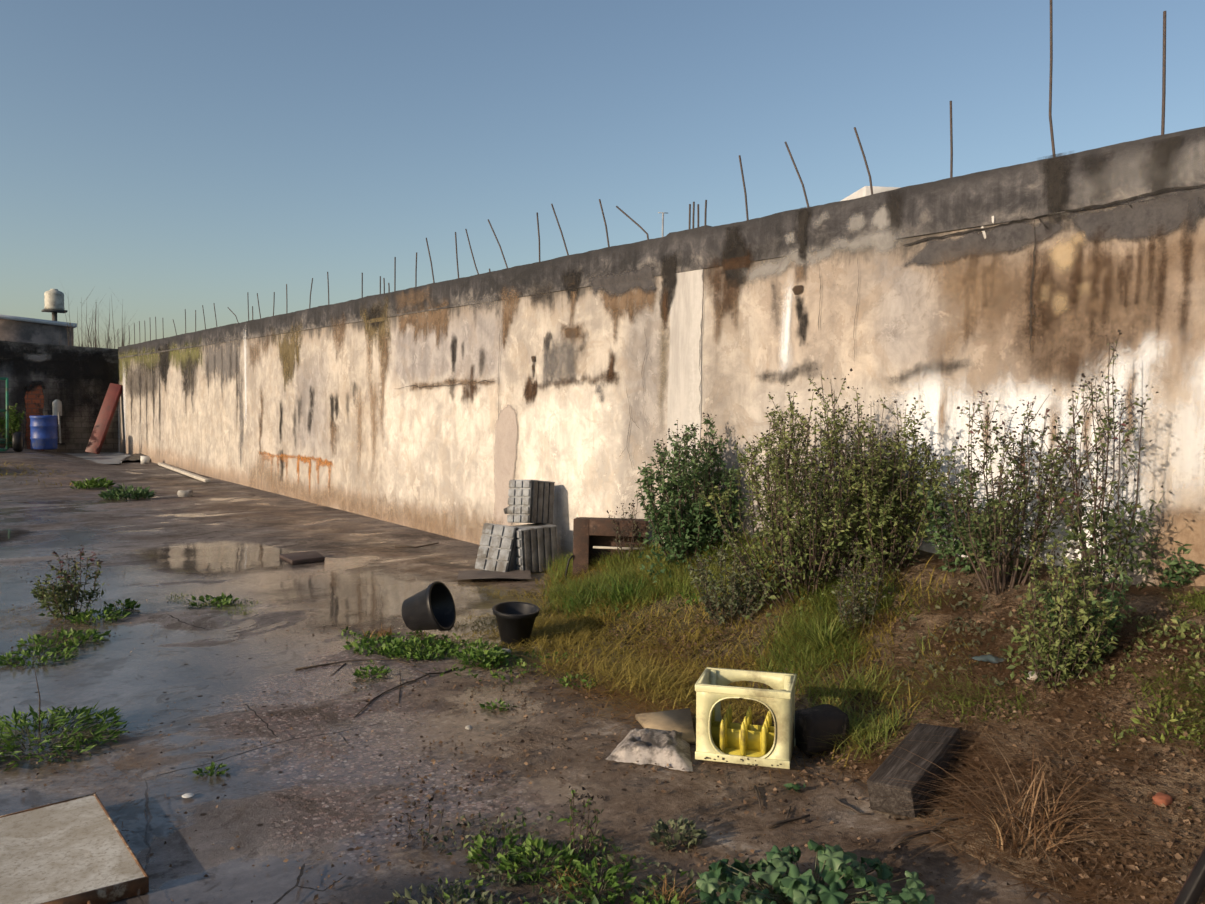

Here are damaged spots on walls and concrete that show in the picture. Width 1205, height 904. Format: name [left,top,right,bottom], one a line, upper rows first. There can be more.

leakage [0,328,300,458]
leakage [251,388,314,490]
rust [260,452,331,491]
leakage [330,303,492,451]
leakage [524,347,617,402]
leakage [469,255,676,344]
leakage [709,226,750,339]
leakage [763,286,812,382]
leakage [795,207,811,259]
crack [903,184,1205,350]
leakage [905,135,1205,342]
crack [137,700,396,904]